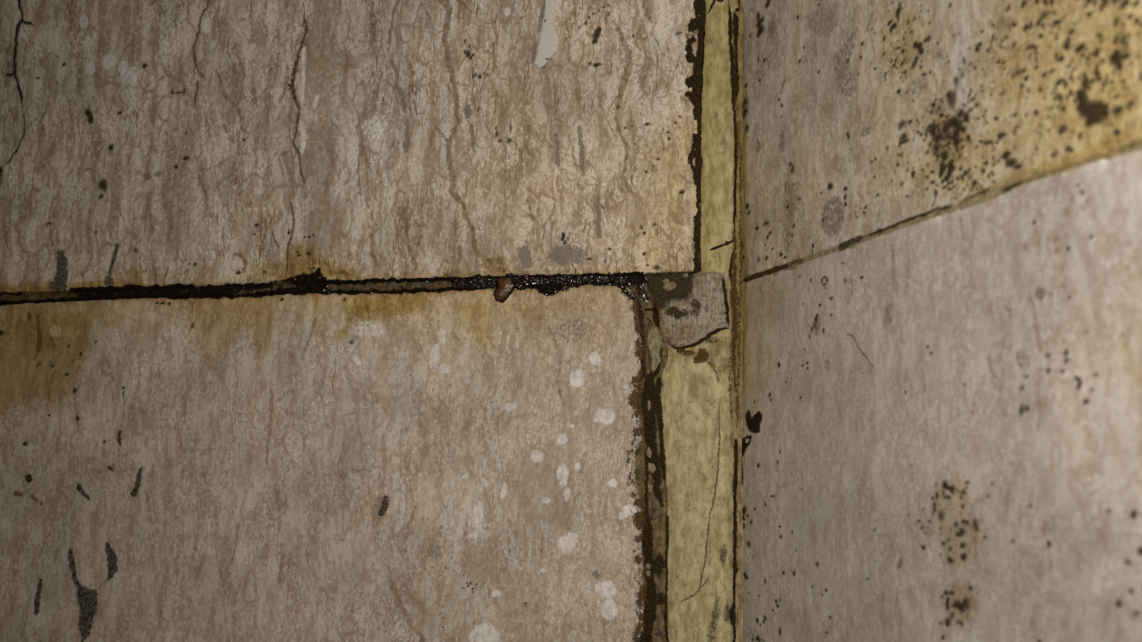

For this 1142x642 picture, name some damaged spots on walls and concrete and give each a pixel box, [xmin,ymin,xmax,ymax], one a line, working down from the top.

leakage [749,0,770,38]
crack [3,0,34,167]
crack [271,3,308,272]
leakage [820,0,1142,235]
leakage [0,0,706,642]
spalling [646,271,732,372]
leakage [799,275,833,370]
leakage [1046,349,1097,404]
leakage [708,400,795,642]
leakage [907,476,986,575]
leakage [933,586,983,639]